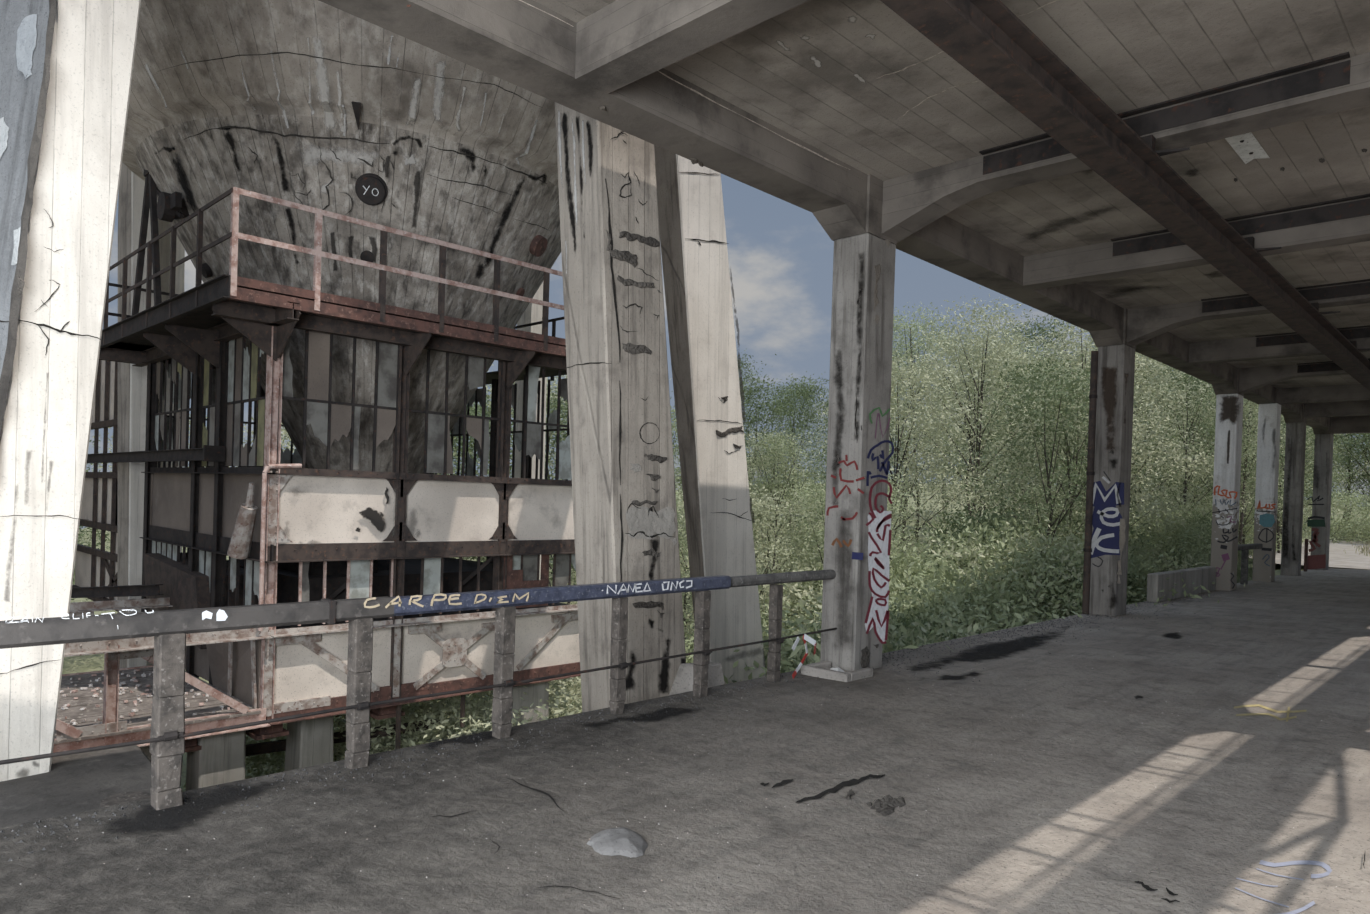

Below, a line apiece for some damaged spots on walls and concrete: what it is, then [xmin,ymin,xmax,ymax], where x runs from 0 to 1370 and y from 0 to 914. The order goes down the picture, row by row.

crack [157,52,543,108]
spalling [0,0,56,435]
crack [185,126,395,213]
crack [427,146,550,231]
damp [516,112,593,274]
crack [0,209,101,355]
crack [760,774,885,803]